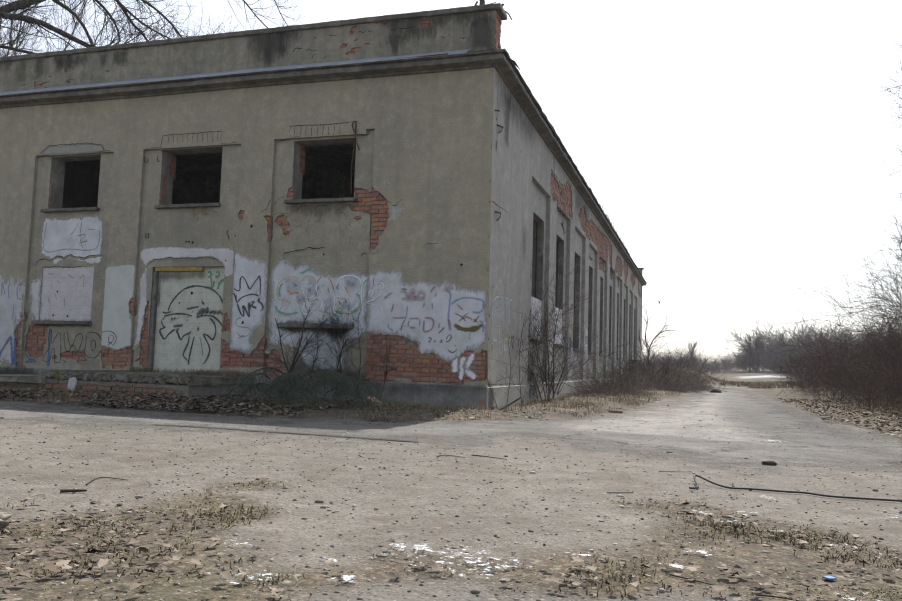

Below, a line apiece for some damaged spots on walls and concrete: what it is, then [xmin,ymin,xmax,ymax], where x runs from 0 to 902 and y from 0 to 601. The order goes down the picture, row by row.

leakage [388,11,491,54]
spalling [349,121,389,253]
spalling [550,170,641,297]
spalling [15,312,87,368]
spalling [98,298,149,369]
spalling [220,313,284,377]
spalling [365,331,489,385]